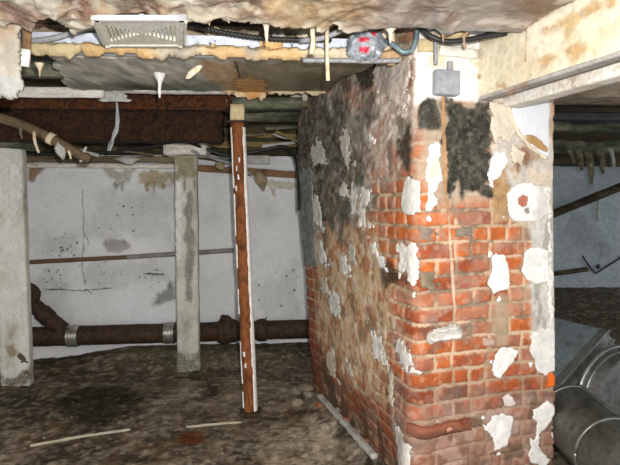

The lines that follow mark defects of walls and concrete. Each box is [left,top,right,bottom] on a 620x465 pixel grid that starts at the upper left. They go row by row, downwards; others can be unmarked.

water stain [222,75,269,101]
mould [298,65,377,249]
mould [396,126,411,170]
water stain [418,96,510,213]
peeling [489,101,550,166]
crack [47,190,110,293]
water stain [109,155,196,299]
flaking render [396,215,441,298]
spalling [455,226,472,237]
peeling [528,438,550,465]